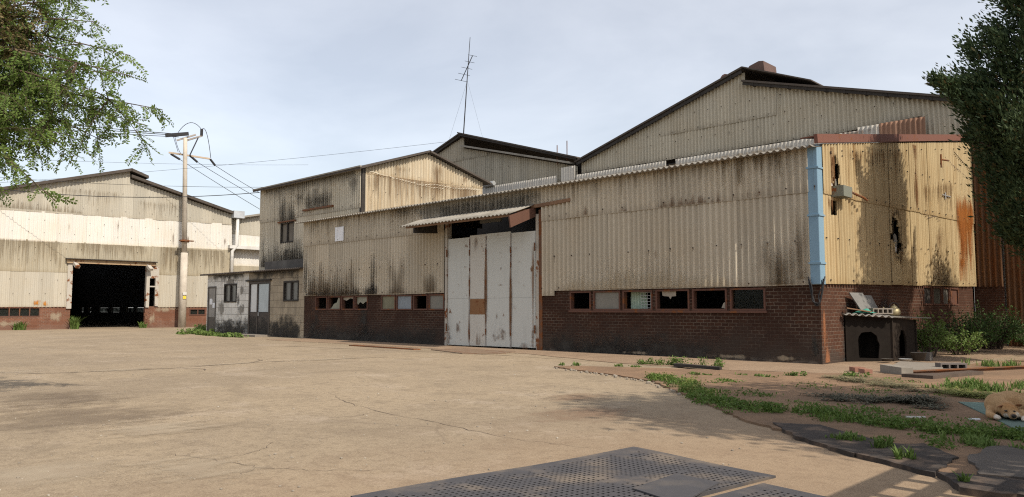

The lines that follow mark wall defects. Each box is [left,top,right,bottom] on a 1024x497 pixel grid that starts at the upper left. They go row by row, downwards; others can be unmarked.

rust [957,203,973,279]